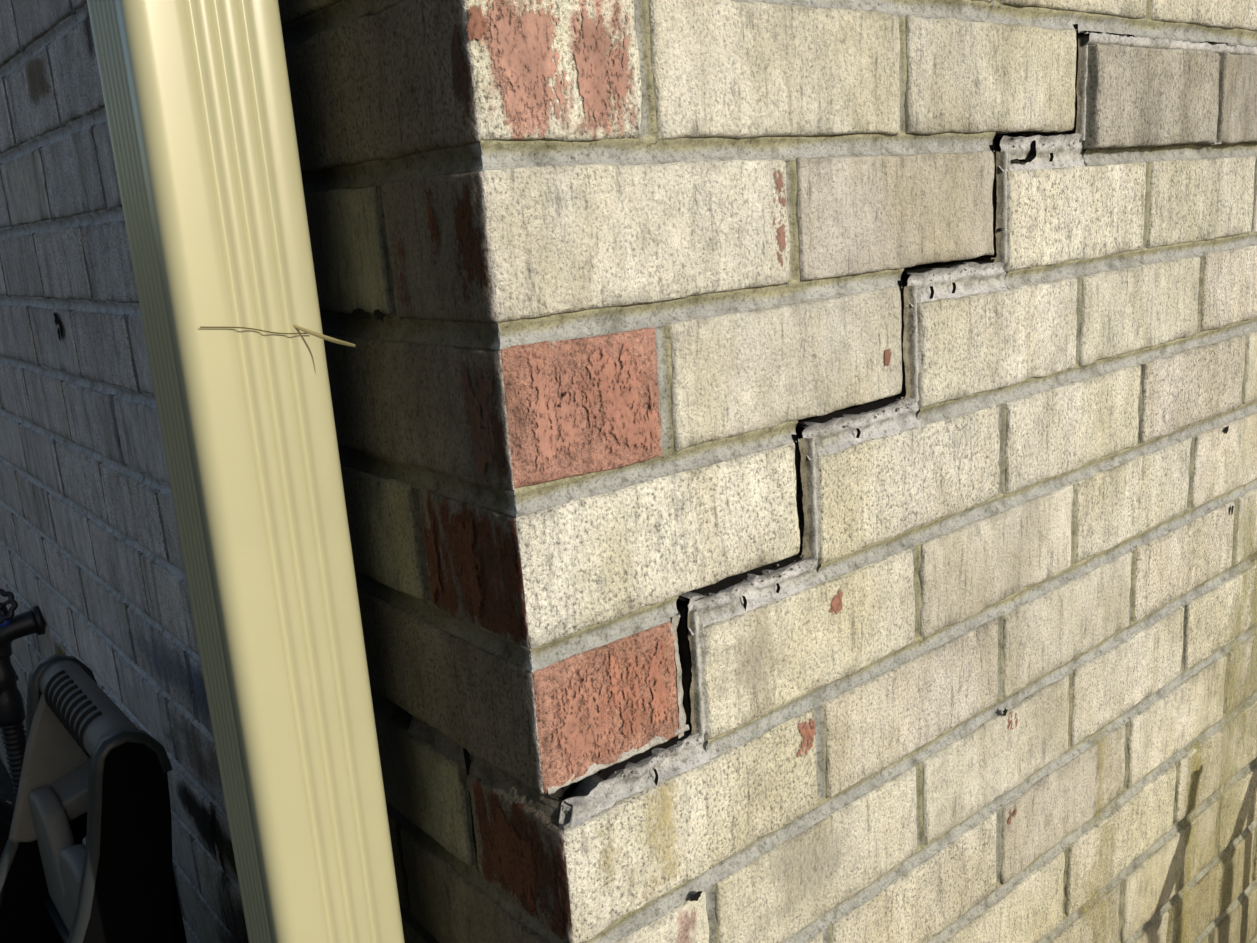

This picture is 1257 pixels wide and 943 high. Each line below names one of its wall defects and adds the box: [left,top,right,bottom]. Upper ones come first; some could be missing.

crack [562,24,1135,792]
damp [177,785,249,943]
crack [463,748,489,872]
damp [1177,743,1201,942]
damp [1216,507,1257,920]